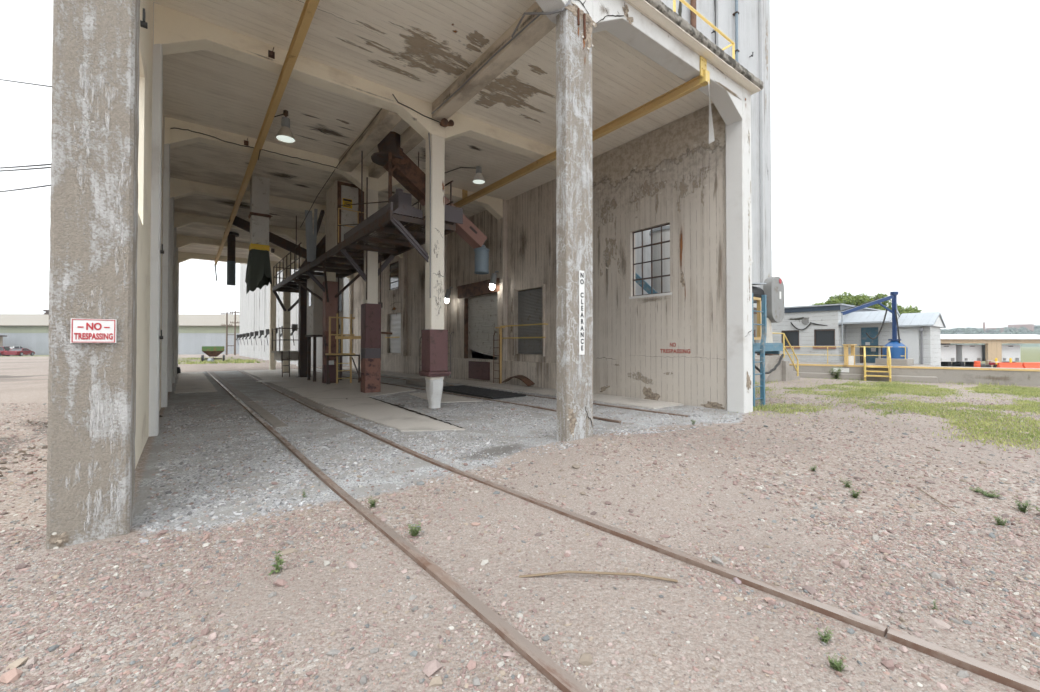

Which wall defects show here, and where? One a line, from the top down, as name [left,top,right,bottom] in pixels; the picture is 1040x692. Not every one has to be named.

peeling [338,20,489,81]
peeling [475,65,555,122]
spalling [615,364,660,400]